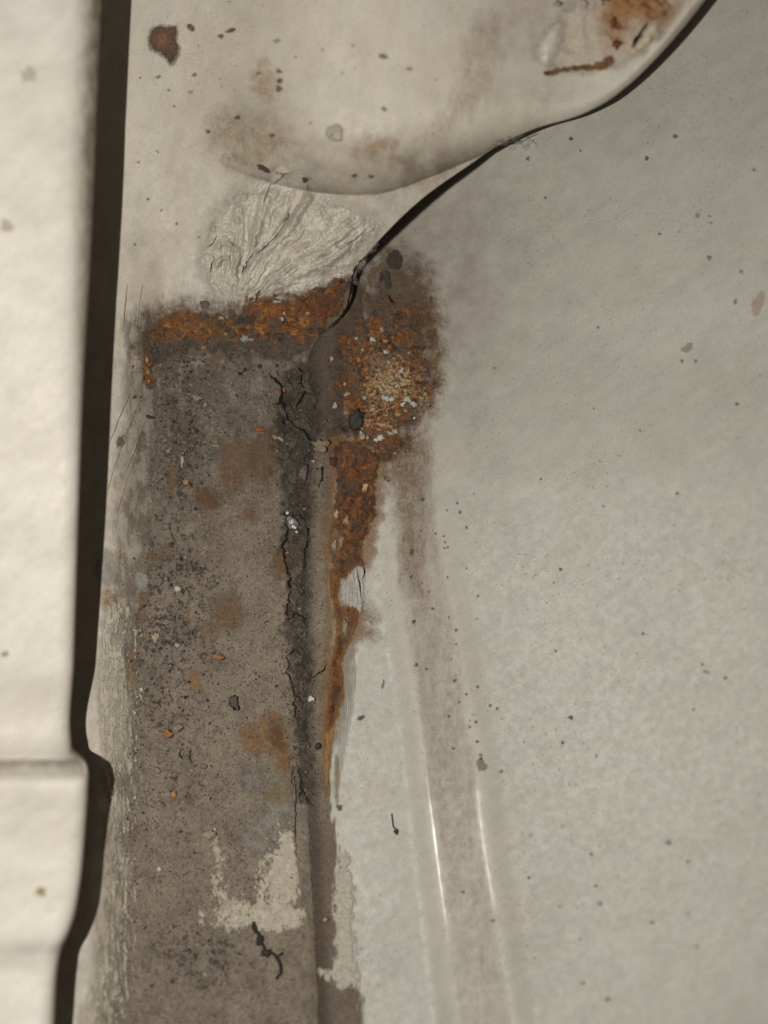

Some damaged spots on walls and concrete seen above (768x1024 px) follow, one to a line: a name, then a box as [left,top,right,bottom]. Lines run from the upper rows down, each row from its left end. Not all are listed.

corrosion [533,0,684,76]
crack [269,367,311,445]
corrosion [130,248,441,801]
crack [281,510,327,728]